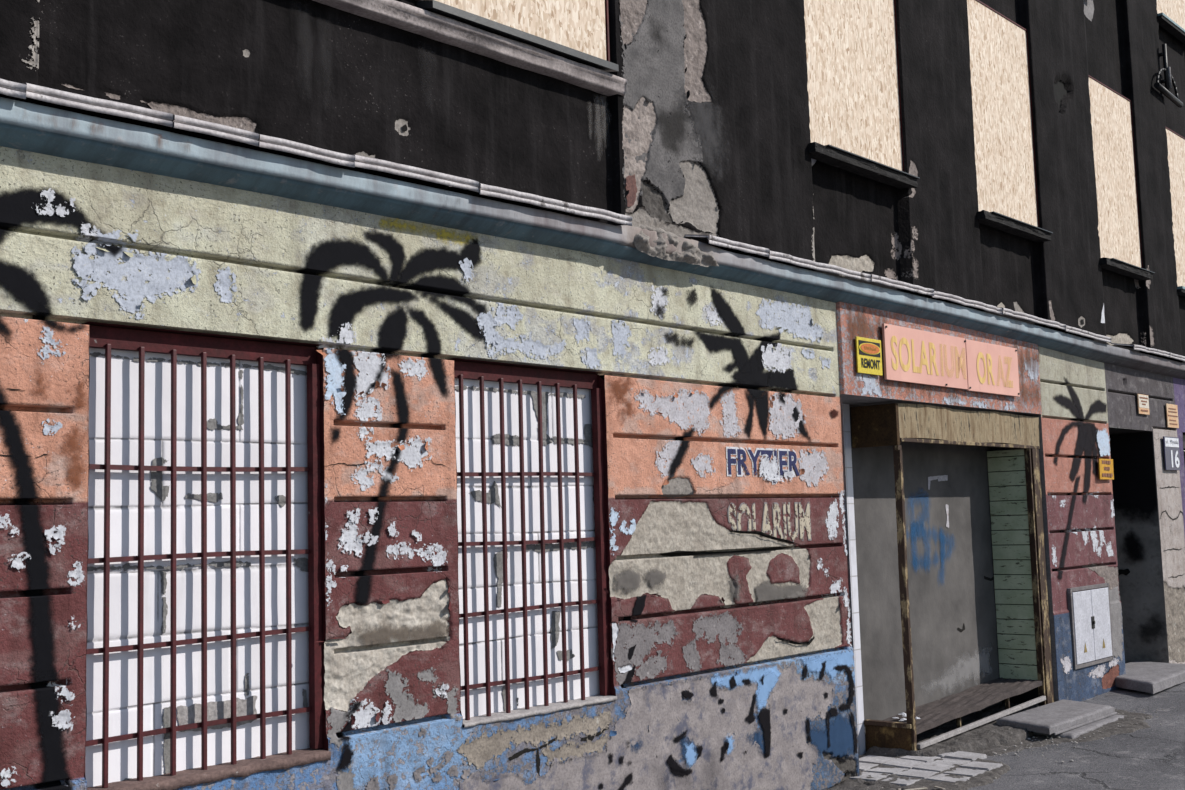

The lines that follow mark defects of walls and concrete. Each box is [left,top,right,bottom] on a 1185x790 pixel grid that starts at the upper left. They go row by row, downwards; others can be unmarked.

flaking render [682,0,712,103]
peeling [35,188,75,217]
flaking render [622,97,722,245]
peeling [71,223,201,320]
flaking render [829,226,919,281]
peeling [756,298,831,373]
peeling [316,322,432,491]
peeling [8,552,31,570]
peeling [45,525,66,555]
flaking render [603,377,852,674]
flaking render [1067,525,1119,590]
flaking render [317,507,452,733]